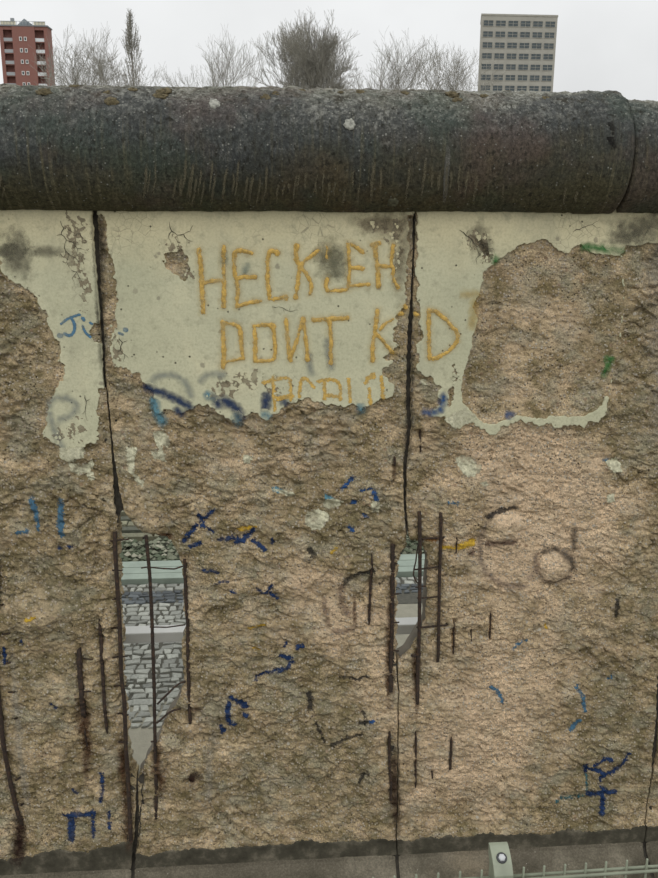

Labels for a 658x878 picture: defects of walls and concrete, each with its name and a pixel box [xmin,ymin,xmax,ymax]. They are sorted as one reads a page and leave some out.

leakage [0,241,52,269]
crack [409,215,417,297]
spalling [0,210,658,861]
corrosion [13,818,25,861]